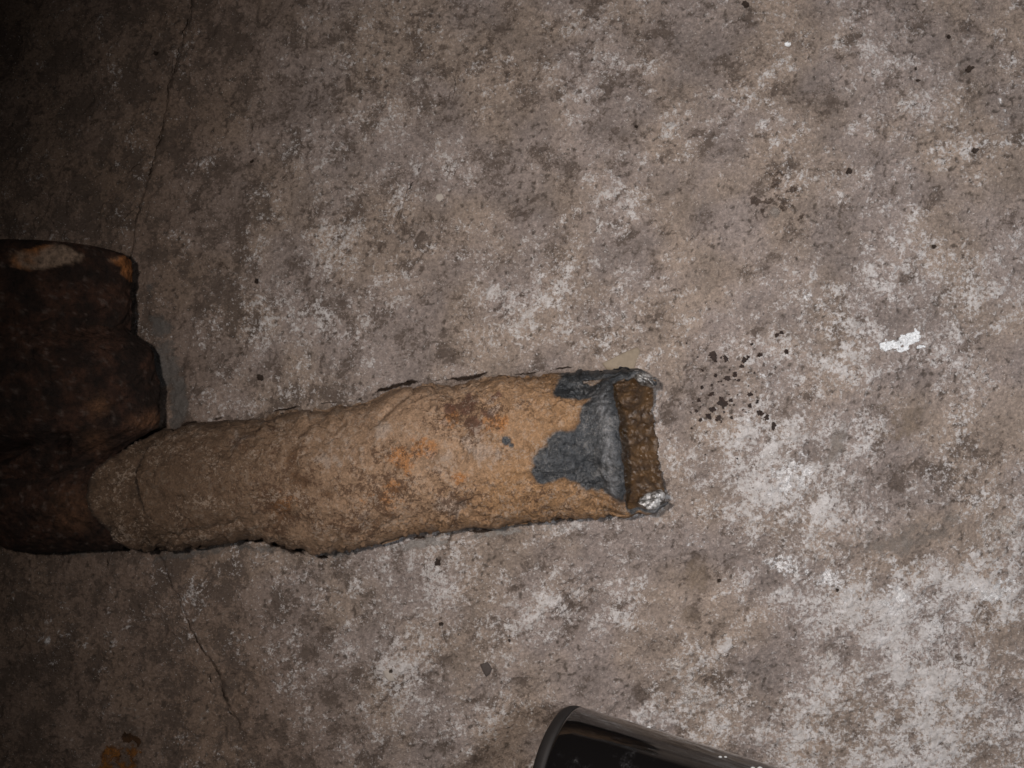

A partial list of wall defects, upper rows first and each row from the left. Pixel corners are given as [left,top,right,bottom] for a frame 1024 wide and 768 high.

crack [184,613,234,716]